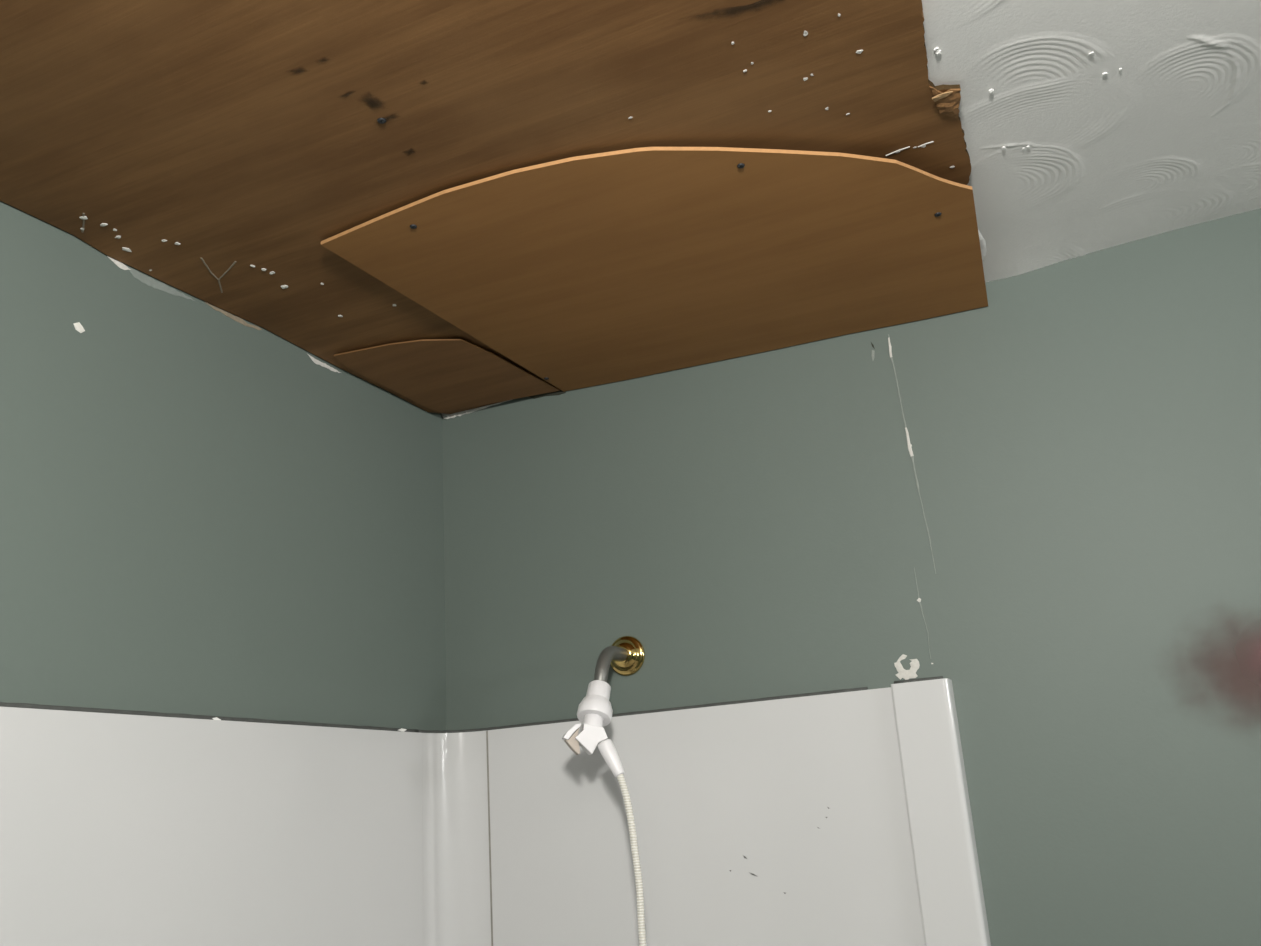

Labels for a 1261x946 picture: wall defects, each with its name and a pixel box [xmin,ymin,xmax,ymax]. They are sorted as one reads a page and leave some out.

peeling [79,213,288,330]
peeling [308,354,341,373]
crack [888,334,936,664]